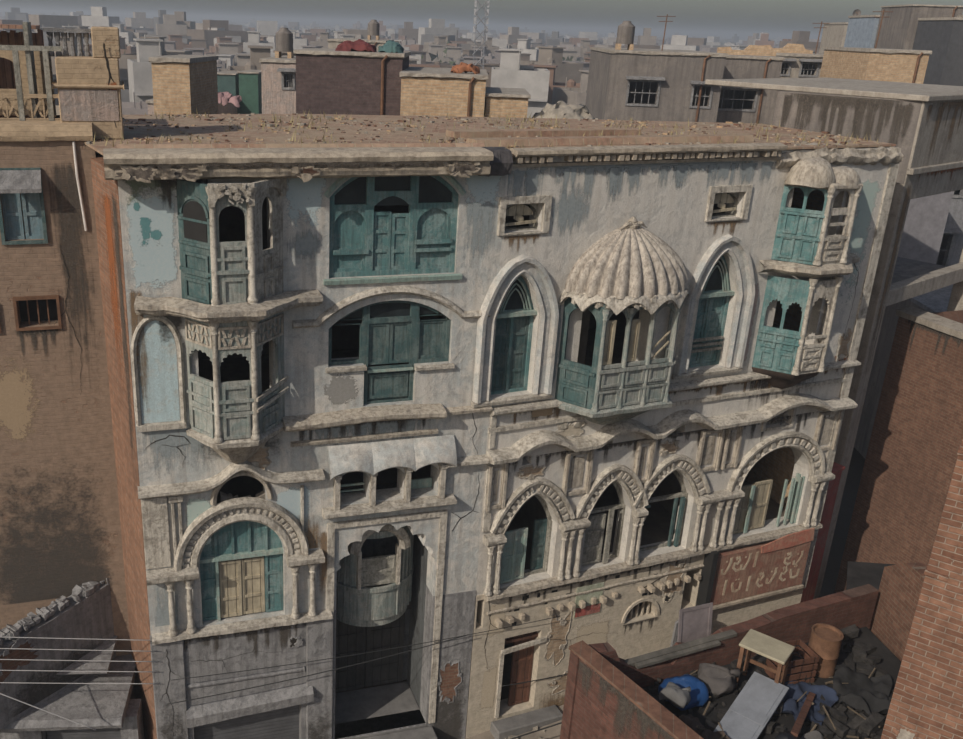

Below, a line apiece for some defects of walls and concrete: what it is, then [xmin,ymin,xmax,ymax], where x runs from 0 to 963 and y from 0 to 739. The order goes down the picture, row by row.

damp [16,164,90,354]
peeling [113,165,207,289]
damp [507,161,776,233]
peeling [323,372,359,405]
crack [144,435,191,462]
crack [452,413,480,531]
flaking render [437,661,463,704]
flaking render [543,611,610,696]